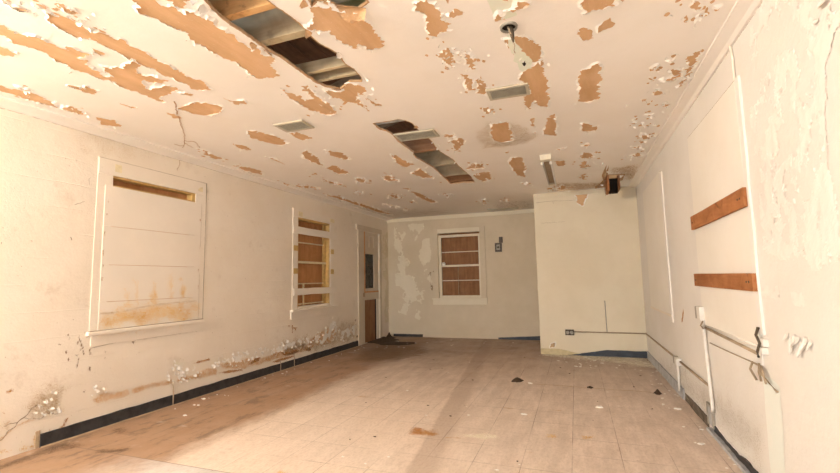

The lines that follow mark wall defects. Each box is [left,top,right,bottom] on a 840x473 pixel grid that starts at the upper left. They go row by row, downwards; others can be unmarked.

peeling [0,84,123,129]
peeling [0,0,253,119]
peeling [131,0,281,79]
peeling [280,76,383,116]
peeling [300,0,386,59]
peeling [411,0,533,186]
peeling [500,34,561,136]
peeling [574,61,607,105]
peeling [577,0,625,41]
crack [123,101,260,184]
peeling [277,149,454,215]
damp [97,274,201,342]